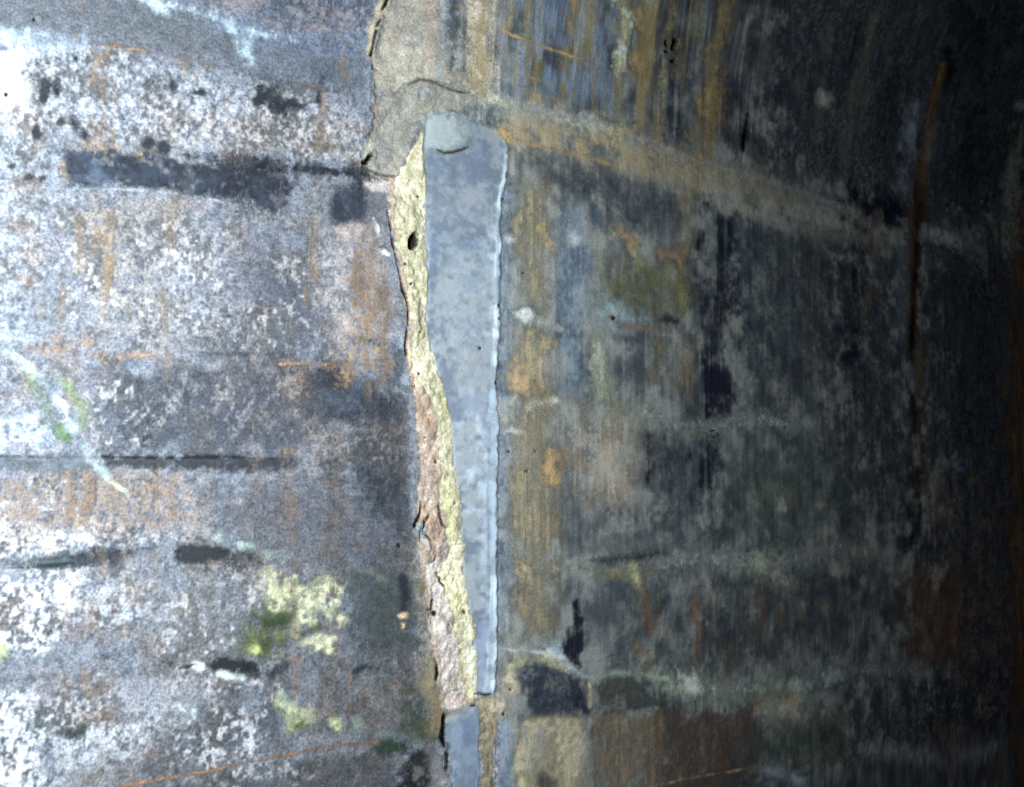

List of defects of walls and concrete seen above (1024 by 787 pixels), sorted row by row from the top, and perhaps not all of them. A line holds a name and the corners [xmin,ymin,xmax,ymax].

damp [57,118,371,226]
damp [253,85,302,113]
rust [897,47,954,433]
spalling [362,0,509,787]
damp [162,533,417,681]
damp [509,599,918,787]